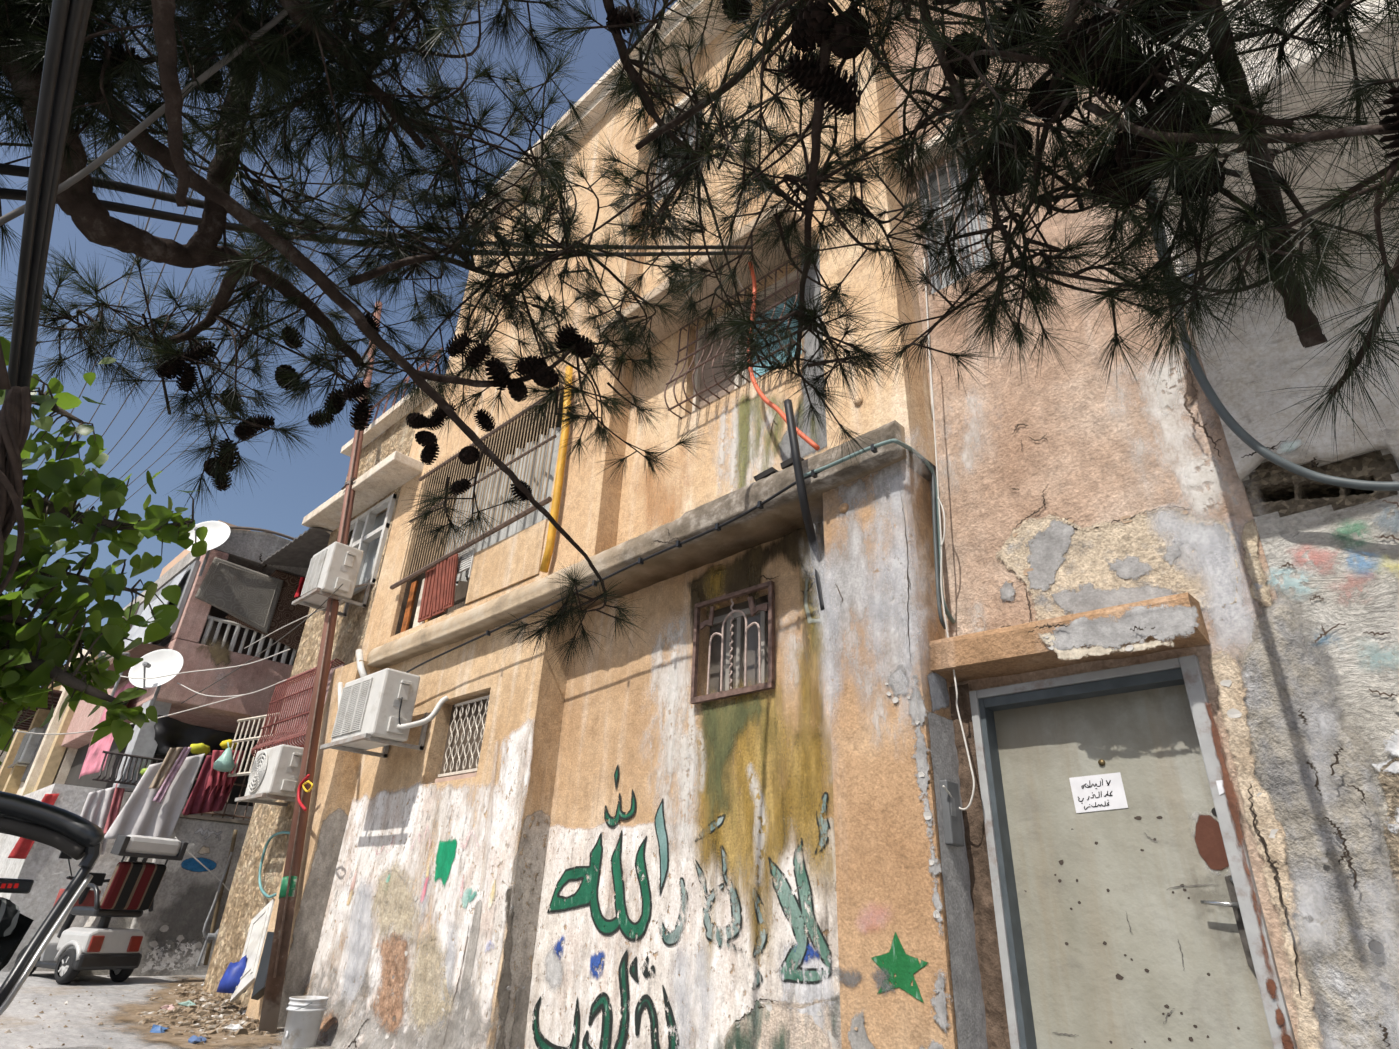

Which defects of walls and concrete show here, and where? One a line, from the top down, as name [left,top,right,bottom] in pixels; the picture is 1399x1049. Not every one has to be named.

spalling [995,507,1272,660]
crack [1373,500,1399,540]
water stain [651,521,836,952]
crack [1369,689,1399,697]
crack [1247,784,1301,996]
crack [1306,746,1366,891]
spalling [1372,757,1399,892]
spalling [723,993,875,1049]
water stain [792,965,822,1027]
spalling [919,970,953,1049]